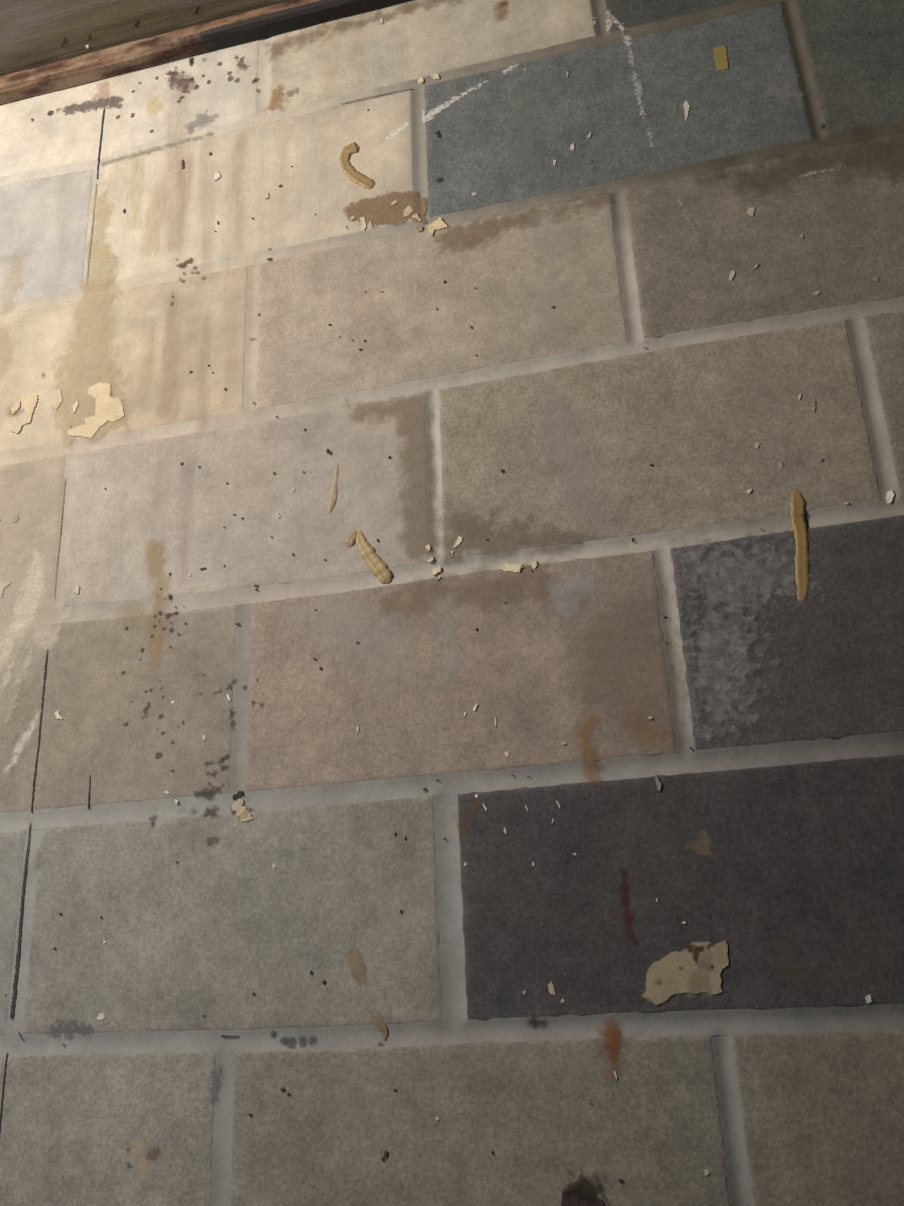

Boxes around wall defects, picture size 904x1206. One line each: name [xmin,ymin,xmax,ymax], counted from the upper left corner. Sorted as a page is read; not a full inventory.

crack [86,109,105,286]
peeling [342,191,448,236]
peeling [7,382,125,439]
crack [53,478,65,599]
water stain [6,714,39,771]
crack [0,649,48,1126]
spalling [642,940,729,1005]